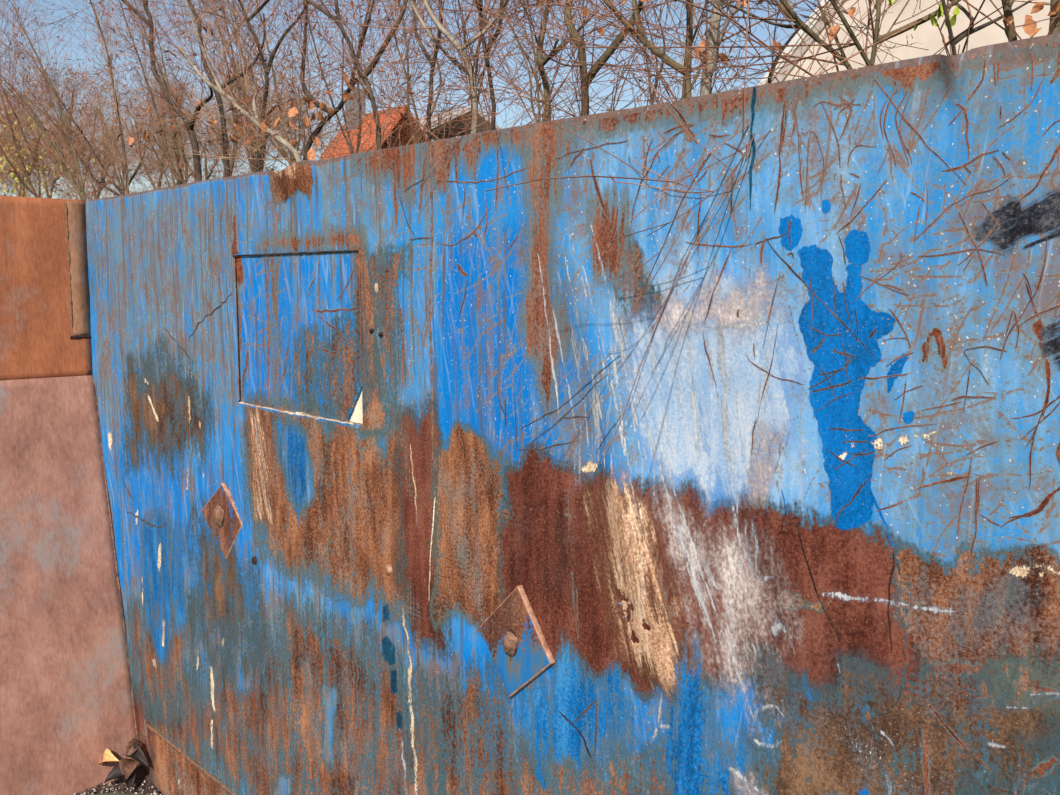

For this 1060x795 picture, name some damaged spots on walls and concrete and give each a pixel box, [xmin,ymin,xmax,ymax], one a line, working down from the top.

rust [123,159,1060,795]
rust [351,41,1060,417]